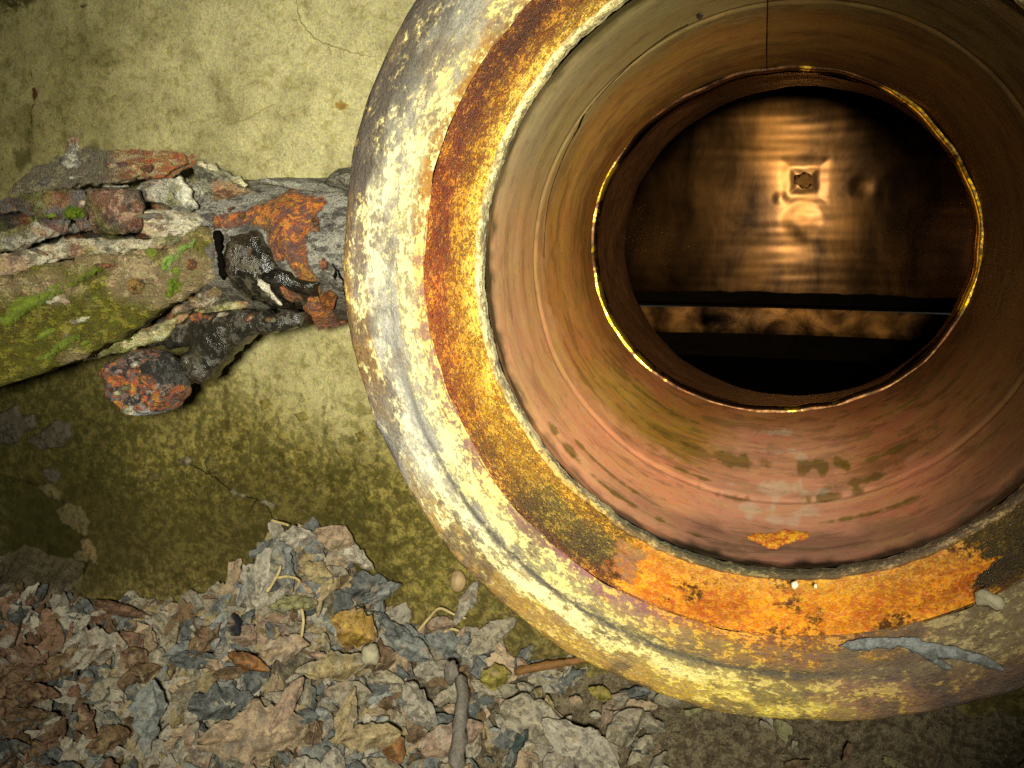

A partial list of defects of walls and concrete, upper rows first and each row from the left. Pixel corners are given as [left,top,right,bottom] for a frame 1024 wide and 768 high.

crack [296,0,374,57]
crack [147,454,277,519]
rust [748,529,809,550]
rust [600,538,1001,636]